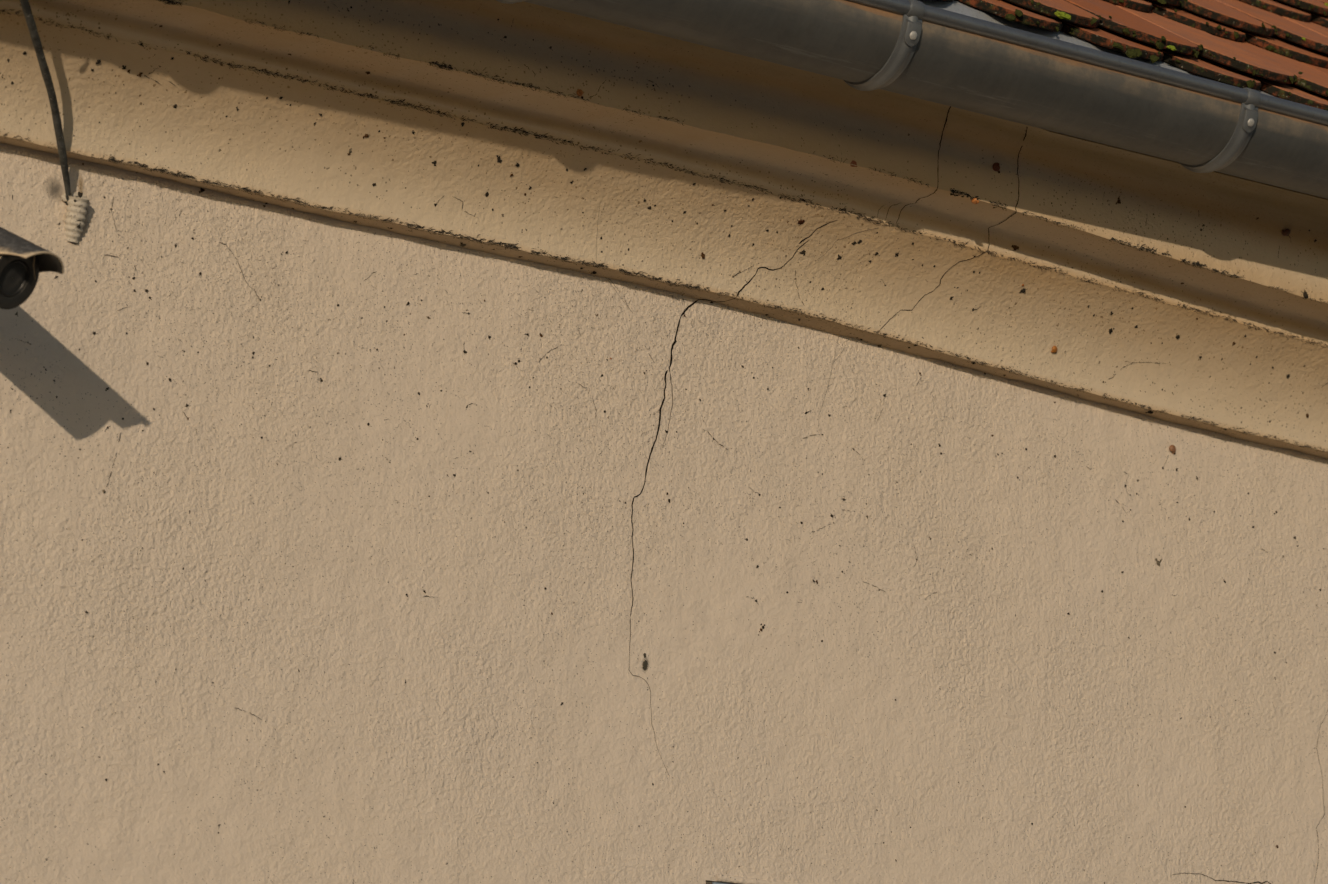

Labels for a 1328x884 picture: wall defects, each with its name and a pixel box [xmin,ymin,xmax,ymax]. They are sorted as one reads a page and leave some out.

crack [880,127,1028,330]
crack [629,106,951,777]
crack [1174,873,1271,884]